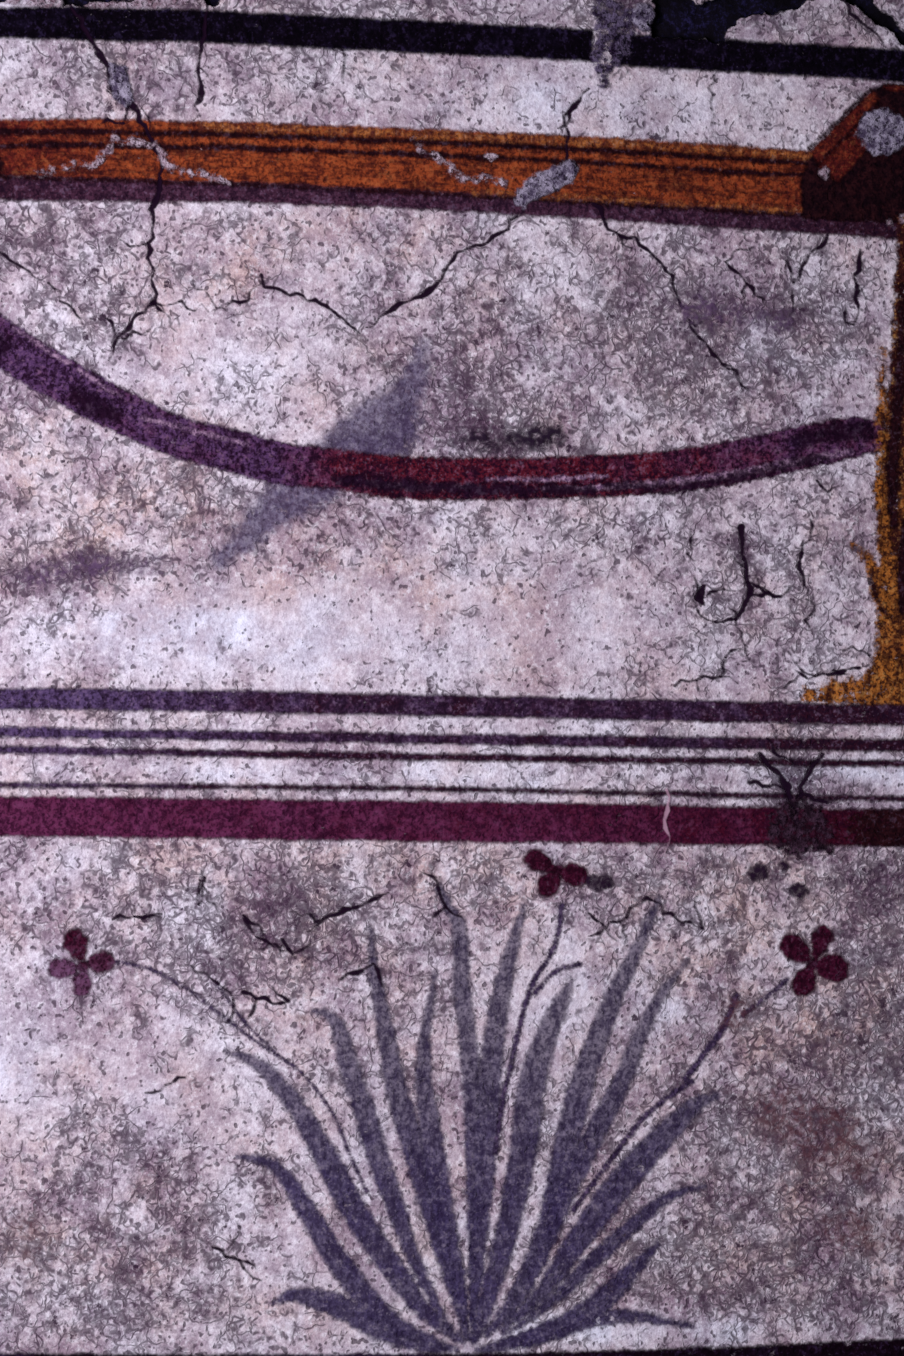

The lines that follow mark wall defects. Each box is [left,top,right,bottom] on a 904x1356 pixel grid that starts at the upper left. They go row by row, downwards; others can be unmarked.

spalling [0,0,220,9]
flaking render [589,0,806,88]
flaking render [846,0,904,45]
crack [557,88,589,162]
spalling [856,108,904,156]
crack [0,2,518,361]
spalling [416,145,578,209]
crack [592,202,746,390]
crack [724,234,828,312]
crack [673,479,834,691]
crack [785,645,870,687]
crack [748,738,834,851]